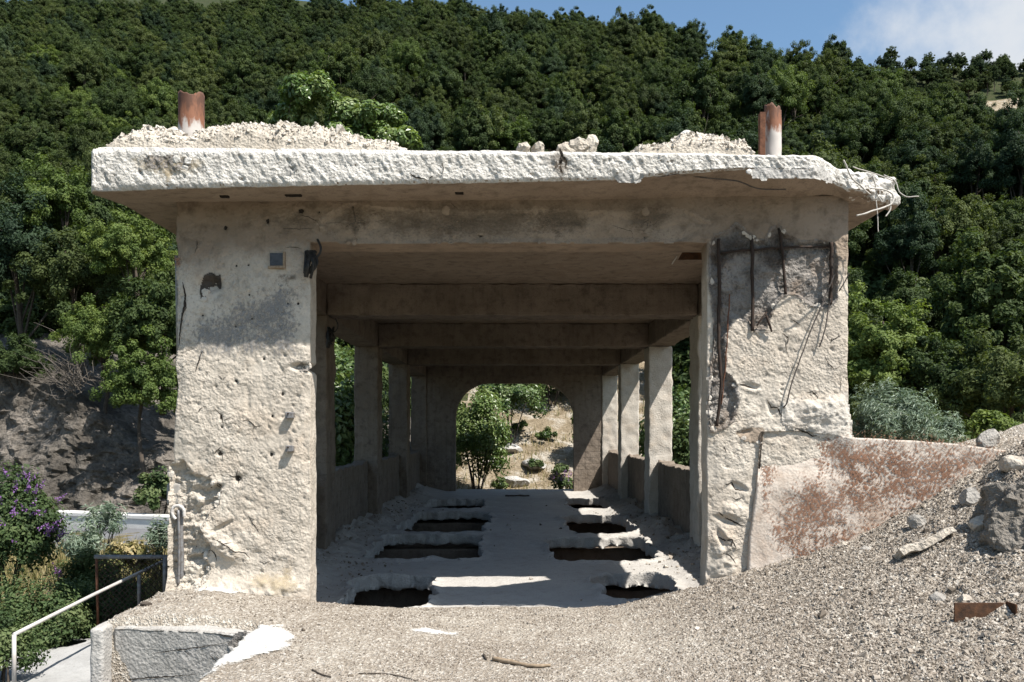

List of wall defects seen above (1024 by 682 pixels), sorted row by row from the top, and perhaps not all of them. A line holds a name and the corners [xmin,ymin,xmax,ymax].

crack [178,282,222,379]
spalling [200,273,222,302]
spalling [316,203,840,446]
spalling [781,392,854,439]
spalling [165,459,223,592]
rust [758,429,1004,558]